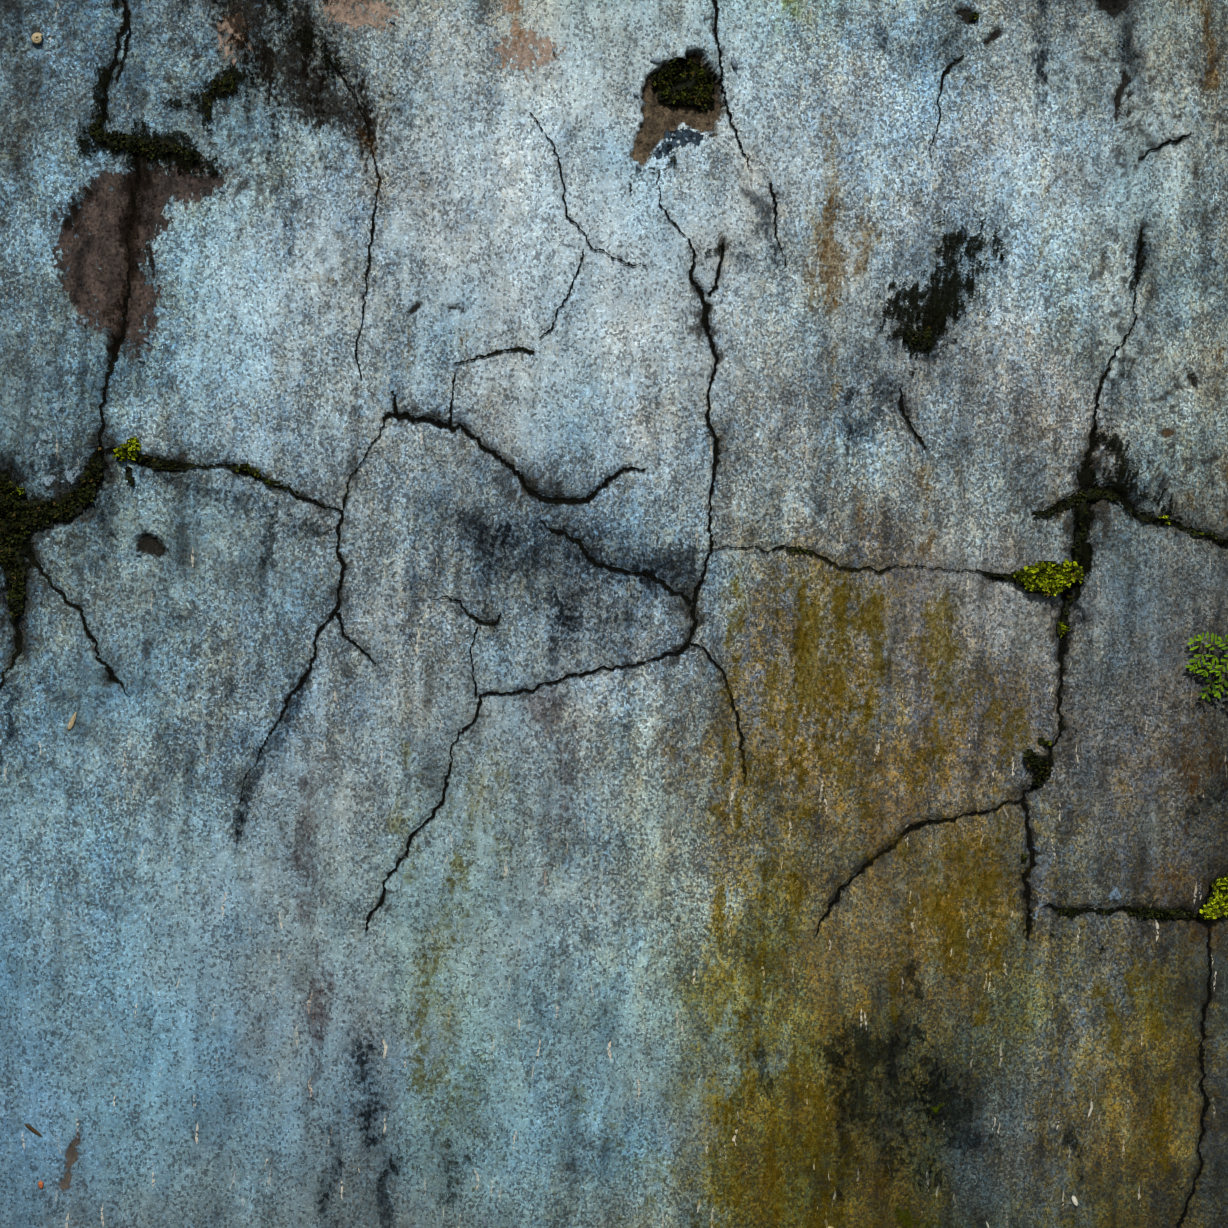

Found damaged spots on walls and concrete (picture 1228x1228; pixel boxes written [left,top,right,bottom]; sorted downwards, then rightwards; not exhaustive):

crack [99,0,131,122]
peeling [48,152,241,368]
crack [328,58,381,380]
spalling [630,51,724,169]
crack [712,0,786,266]
damp [878,201,1005,376]
crack [929,54,964,158]
crack [1138,133,1192,160]
crack [0,112,1013,932]
crack [814,227,1228,1228]